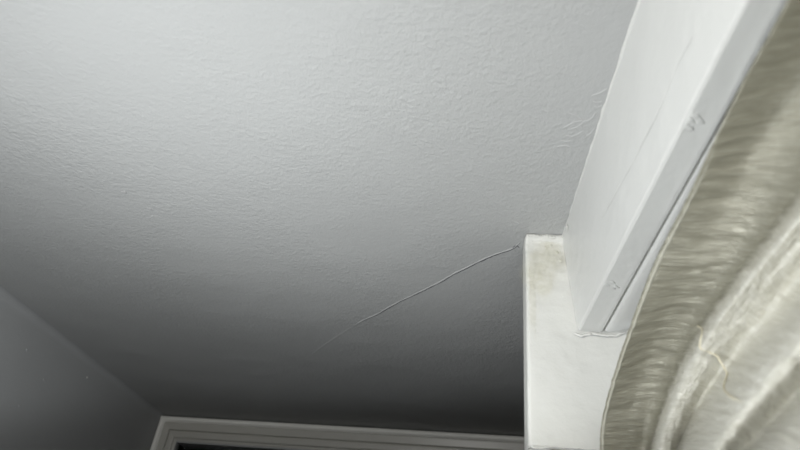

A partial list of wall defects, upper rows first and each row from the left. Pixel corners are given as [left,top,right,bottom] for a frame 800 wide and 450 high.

crack [311,242,520,355]